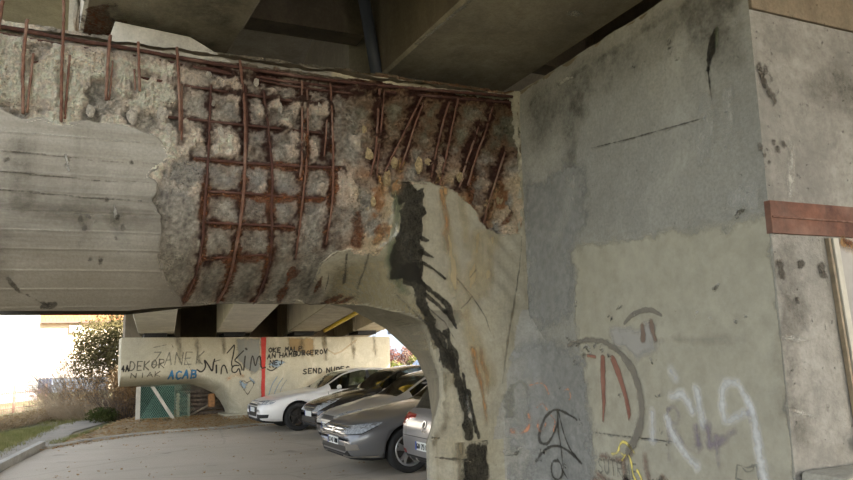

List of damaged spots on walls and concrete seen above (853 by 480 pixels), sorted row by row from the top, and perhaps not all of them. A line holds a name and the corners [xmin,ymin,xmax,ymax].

corrosion [79,5,126,36]
corrosion [182,118,341,305]
spalling [0,0,524,306]
corrosion [350,211,397,251]
corrosion [484,187,513,229]
leakage [700,27,718,163]